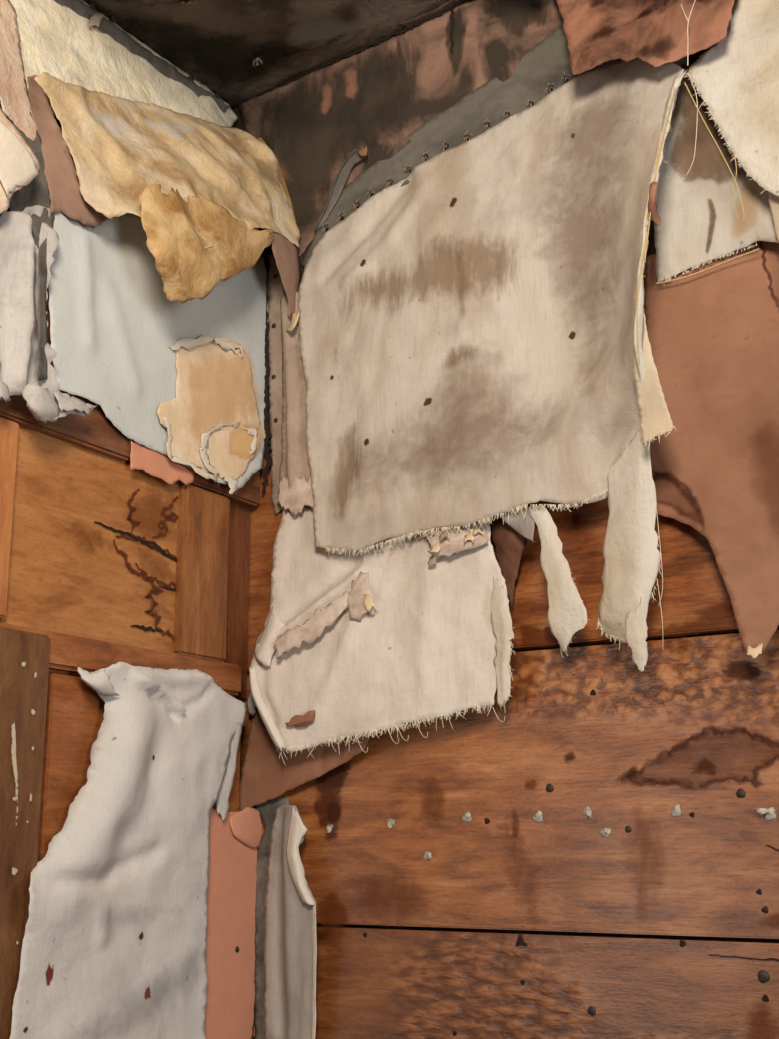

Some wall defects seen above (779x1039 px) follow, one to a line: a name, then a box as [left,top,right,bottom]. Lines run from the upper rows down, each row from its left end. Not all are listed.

peeling [157,334,263,494]
crack [94,521,178,563]
crack [131,624,163,632]
damp [620,727,779,788]